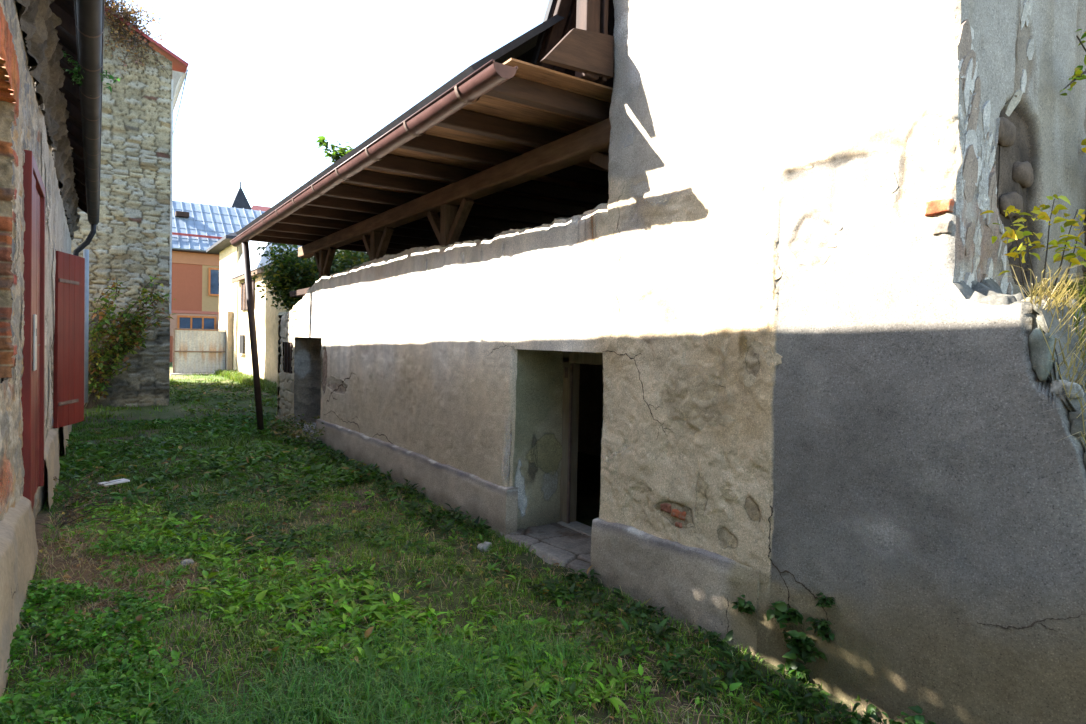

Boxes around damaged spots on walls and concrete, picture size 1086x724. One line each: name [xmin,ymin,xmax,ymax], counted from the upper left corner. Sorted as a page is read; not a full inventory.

peeling [875,0,1035,295]
spalling [320,347,347,393]
crack [607,188,670,441]
spalling [654,474,760,548]
crack [768,501,835,621]
crack [977,614,1086,631]